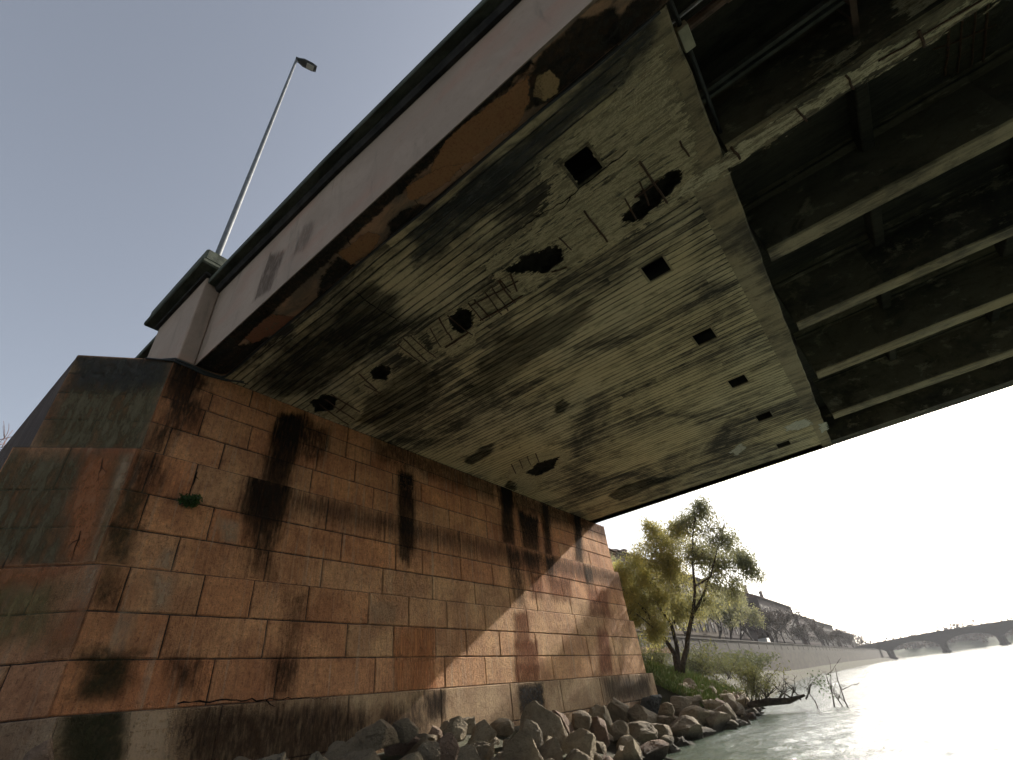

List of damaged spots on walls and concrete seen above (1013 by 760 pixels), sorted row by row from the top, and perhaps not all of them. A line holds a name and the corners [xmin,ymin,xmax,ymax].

spalling [393,0,999,363]
spalling [353,364,395,396]
spalling [307,392,364,425]
peeling [784,419,828,433]
spalling [503,449,574,492]
damp [242,413,618,599]
damp [518,683,545,712]